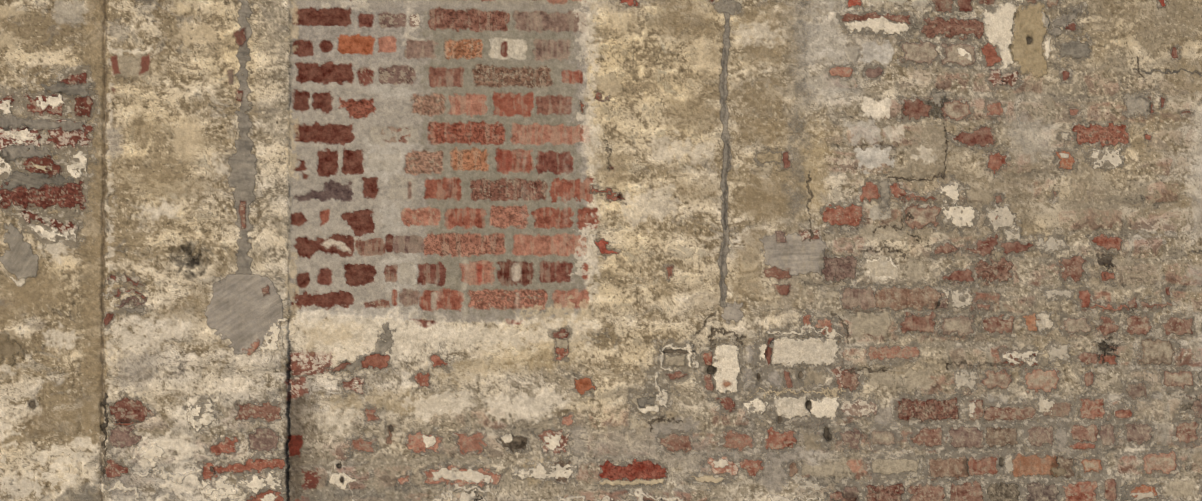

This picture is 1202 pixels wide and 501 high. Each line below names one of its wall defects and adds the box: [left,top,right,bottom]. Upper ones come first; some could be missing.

peeling [620,0,640,8]
peeling [0,64,100,248]
peeling [579,92,610,114]
peeling [590,184,626,205]
crack [696,0,746,350]
peeling [754,147,793,170]
peeling [829,0,1093,177]
peeling [1052,91,1202,174]
spalling [594,174,1202,501]
peeling [98,390,157,486]
peeling [183,396,289,501]
crack [648,416,683,432]